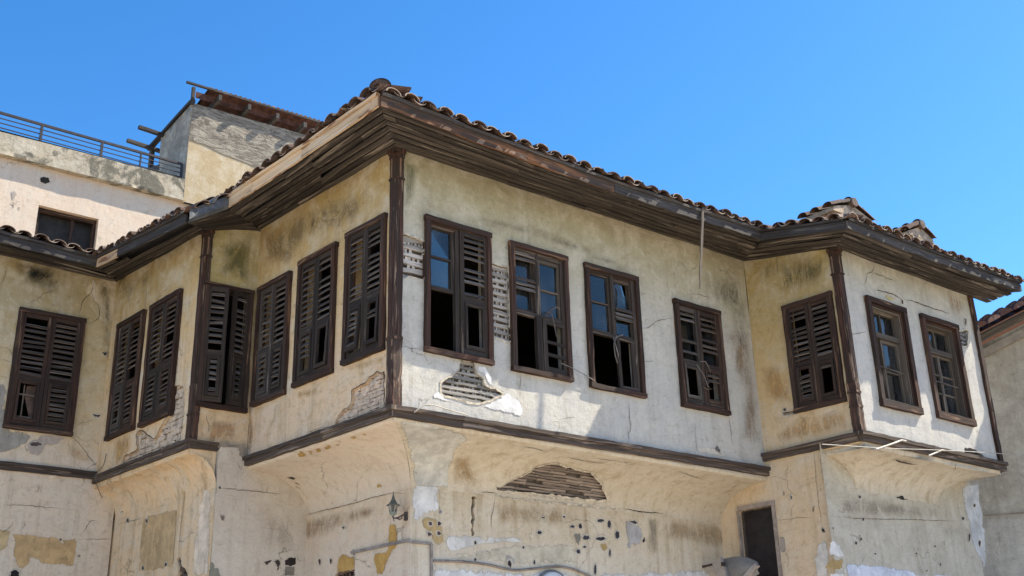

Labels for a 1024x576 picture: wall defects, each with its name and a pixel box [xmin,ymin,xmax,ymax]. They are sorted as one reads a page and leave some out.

crack [865,269,950,314]
spalling [338,371,385,423]
spalling [434,360,523,416]
spalling [123,385,185,463]
spalling [497,463,609,502]
peeling [0,530,81,576]
peeling [139,511,188,576]
peeling [815,526,846,576]